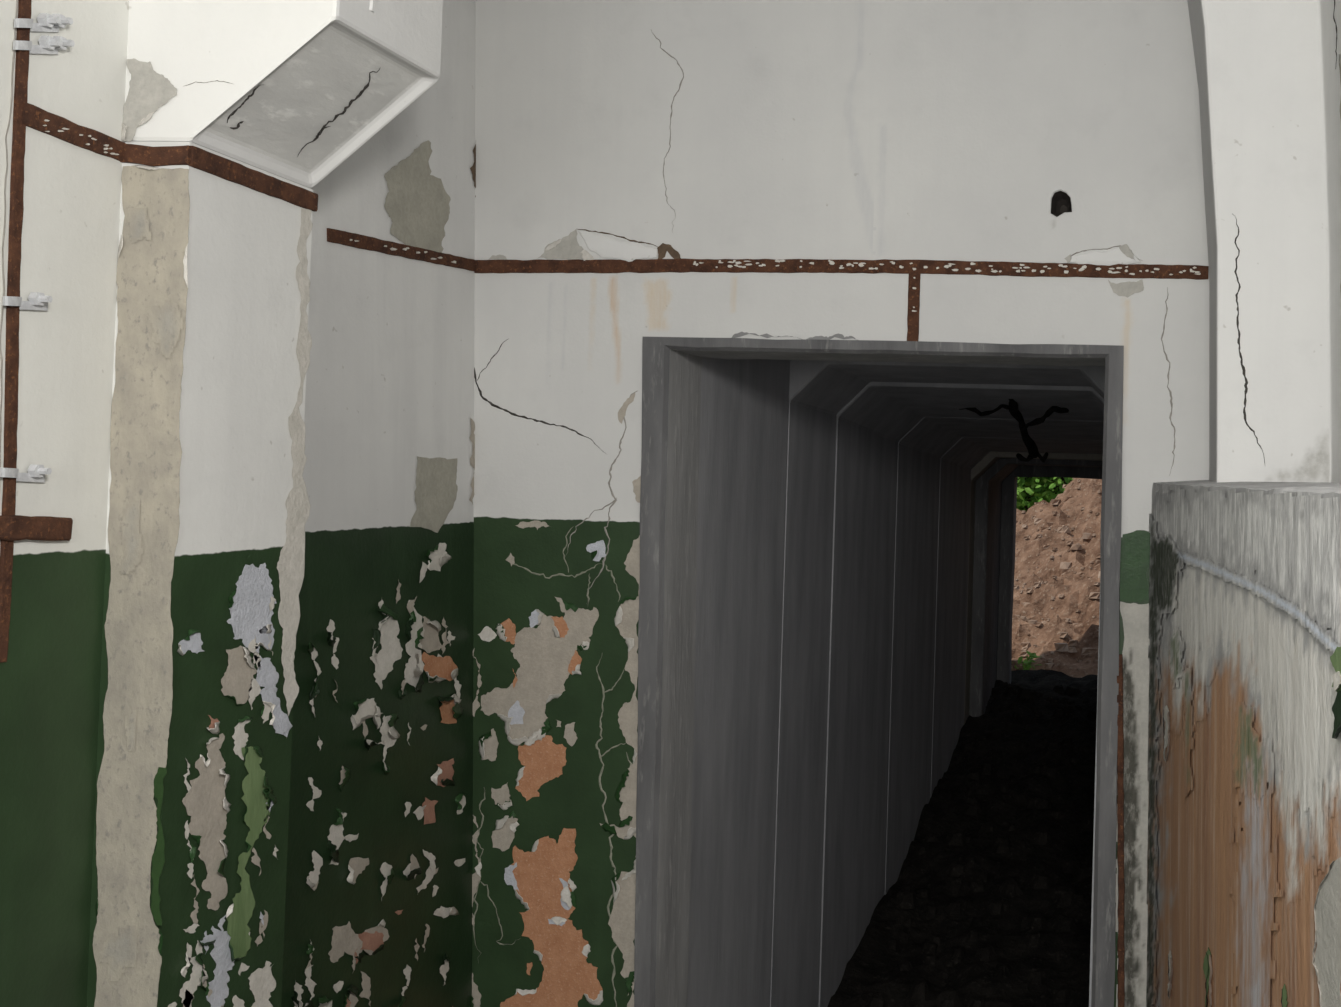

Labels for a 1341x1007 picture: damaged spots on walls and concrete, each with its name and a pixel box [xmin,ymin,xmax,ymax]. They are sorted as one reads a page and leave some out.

crack [1331,0,1339,61]
spalling [121,59,177,142]
crack [298,67,381,155]
spalling [384,140,451,253]
crack [651,30,684,230]
rust [0,0,318,663]
rust [327,228,1209,341]
rust [1118,296,1138,429]
crack [1234,217,1265,463]
crack [474,339,637,603]
flaking render [93,165,641,1007]